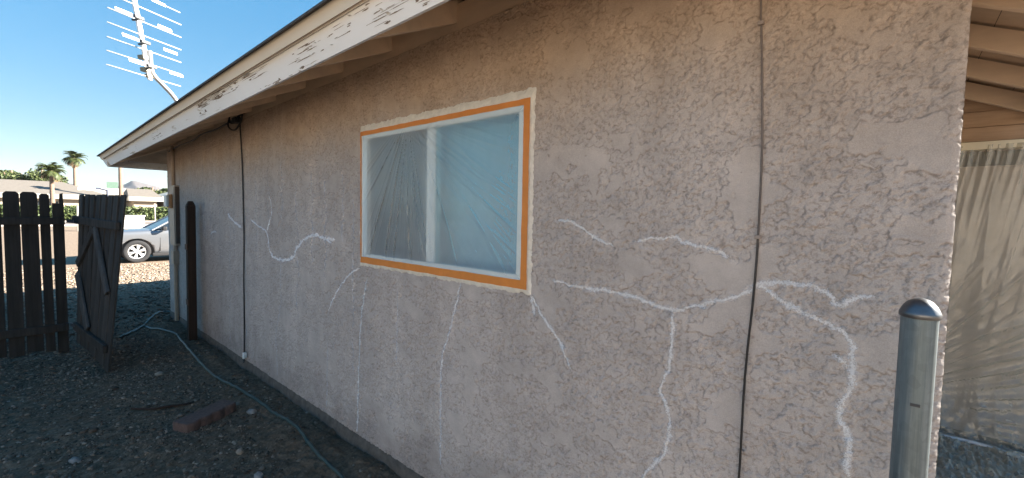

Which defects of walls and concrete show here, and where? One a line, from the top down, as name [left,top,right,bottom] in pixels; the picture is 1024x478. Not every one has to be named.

peeling [197,0,427,117]
crack [211,198,336,366]
crack [328,268,367,431]
crack [439,285,461,465]
crack [530,297,571,369]
crack [558,219,729,259]
crack [553,279,872,478]